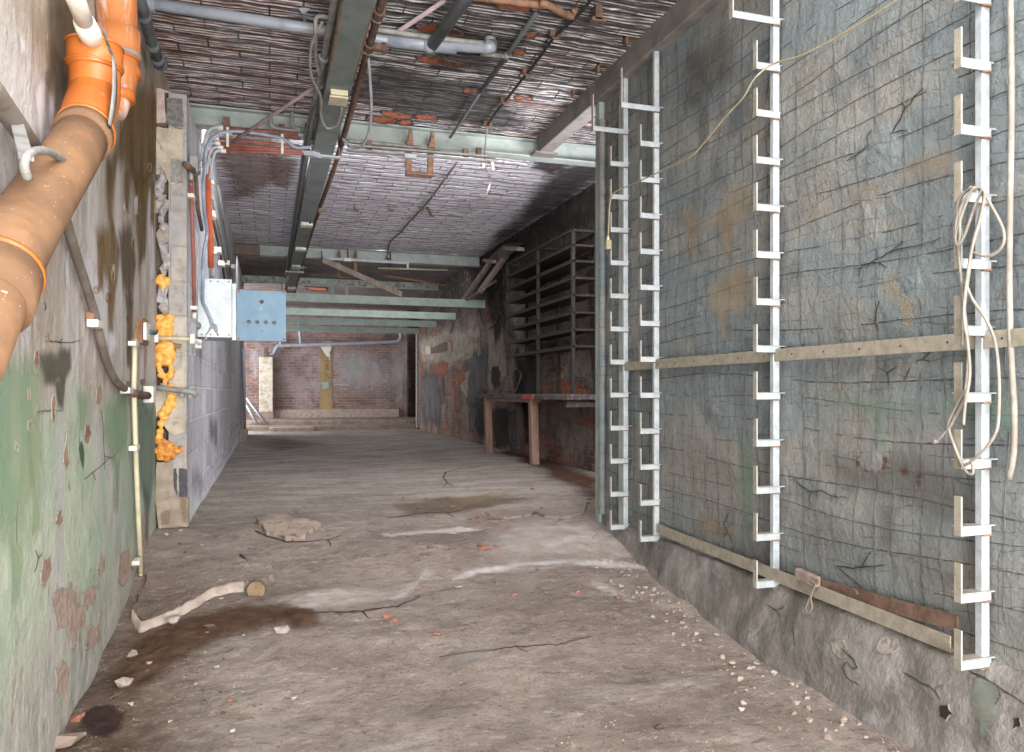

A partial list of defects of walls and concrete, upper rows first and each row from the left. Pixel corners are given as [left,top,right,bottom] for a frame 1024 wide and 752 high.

crack [847,88,923,161]
leakage [65,90,158,366]
leakage [41,350,71,407]
crack [795,480,846,505]
leakage [454,524,645,579]
crack [837,552,883,586]
peeling [40,548,133,654]
crack [312,596,420,619]
leakage [117,589,404,689]
crack [440,636,592,657]